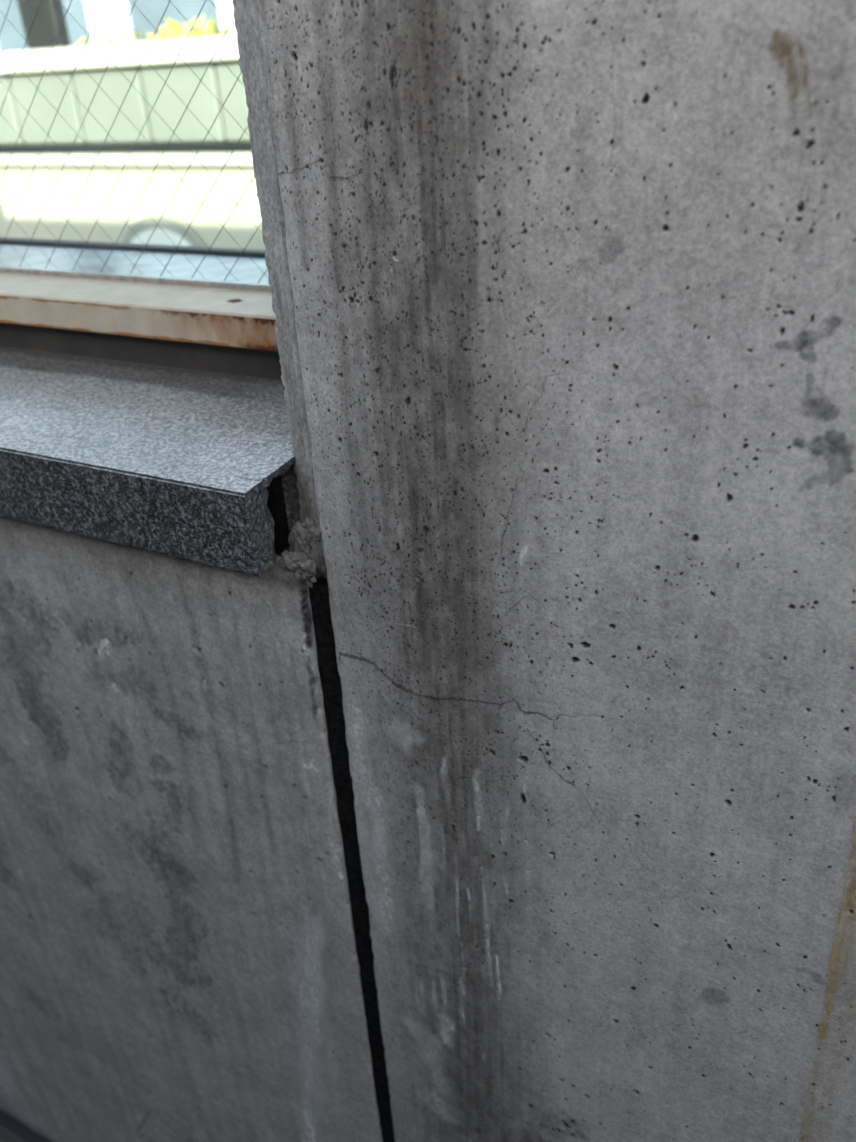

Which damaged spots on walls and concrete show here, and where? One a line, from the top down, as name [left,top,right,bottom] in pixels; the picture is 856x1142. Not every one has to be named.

damp [377,172,502,1140]
damp [793,400,847,457]